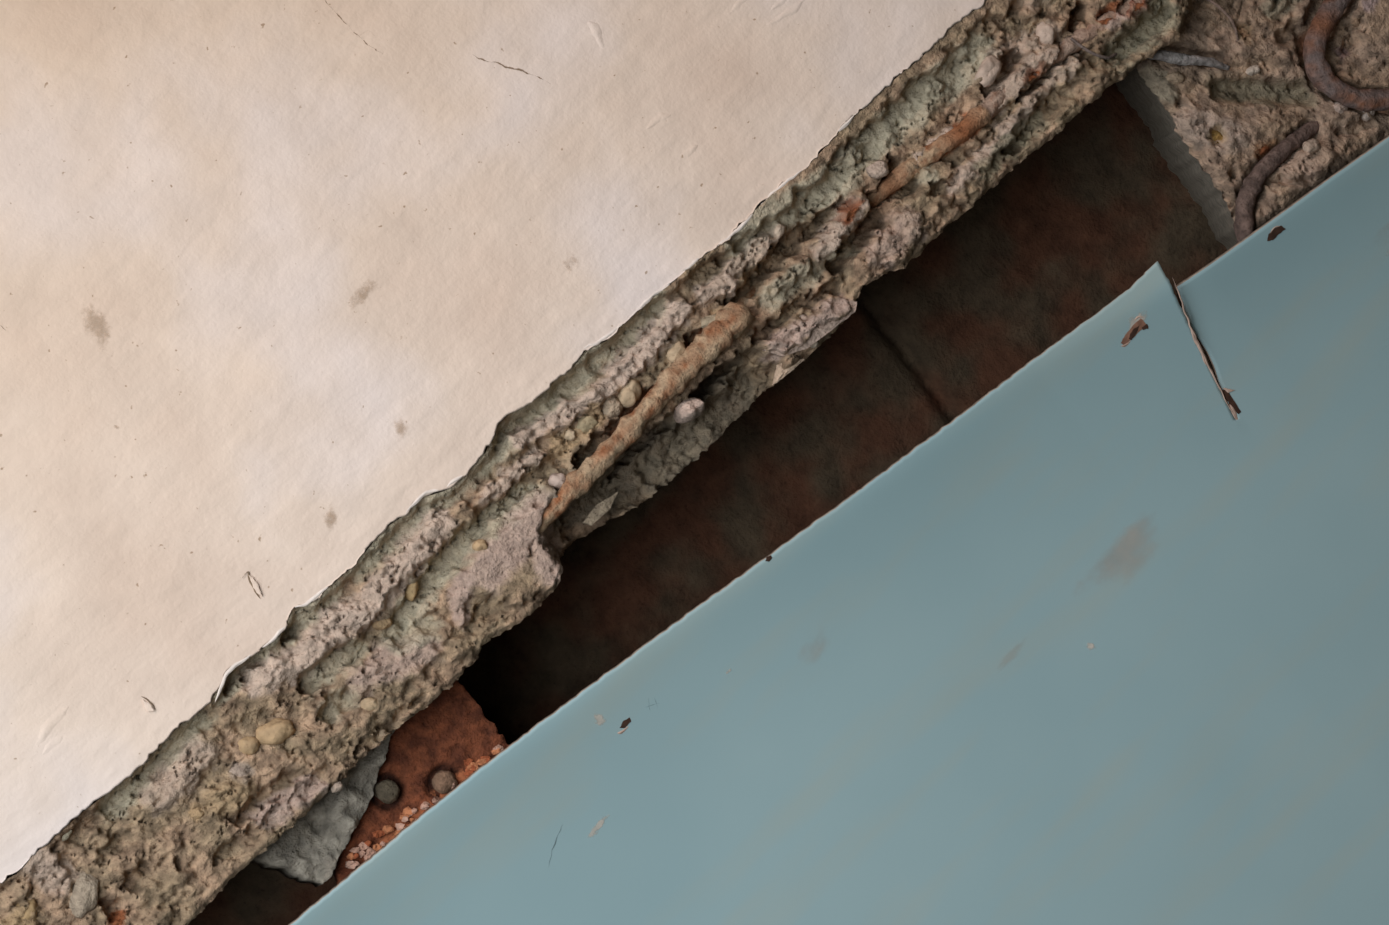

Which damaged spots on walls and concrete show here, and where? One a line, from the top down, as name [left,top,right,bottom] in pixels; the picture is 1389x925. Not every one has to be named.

spalling [974,55,1002,87]
spalling [1116,0,1389,250]
spalling [866,87,1006,208]
spalling [787,301,857,355]
spalling [772,359,805,385]
spalling [539,280,756,533]
spalling [405,582,418,602]
spalling [372,618,392,630]
spalling [360,697,378,712]
spalling [237,736,260,755]
spalling [256,718,295,745]
spalling [69,871,100,919]